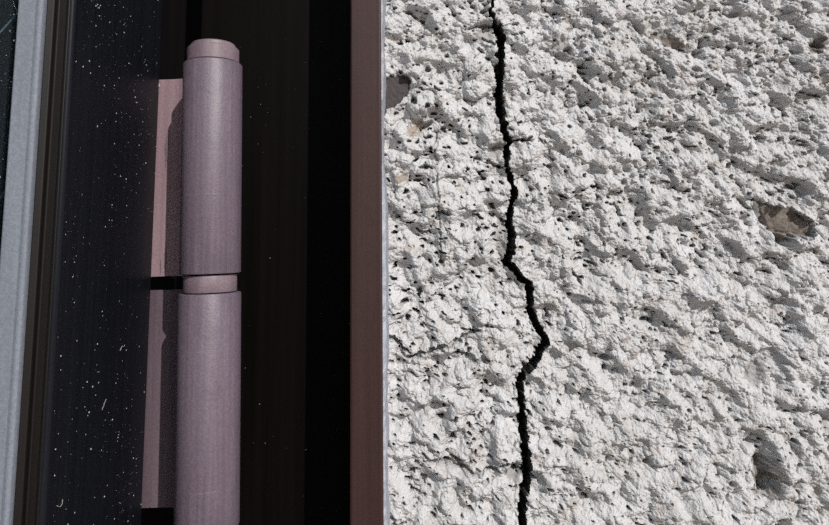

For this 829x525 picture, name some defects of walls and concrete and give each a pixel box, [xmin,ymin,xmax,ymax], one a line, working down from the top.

crack [471,0,551,525]